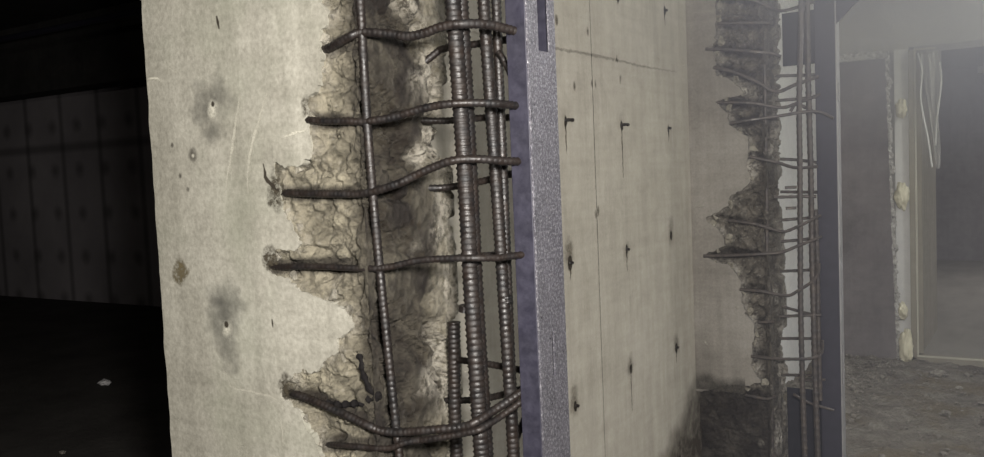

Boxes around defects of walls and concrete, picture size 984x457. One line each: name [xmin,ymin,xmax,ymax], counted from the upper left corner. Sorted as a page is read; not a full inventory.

corrosion [173,261,188,284]
water stain [215,297,230,335]
spalling [266,0,525,457]
spalling [700,0,834,457]